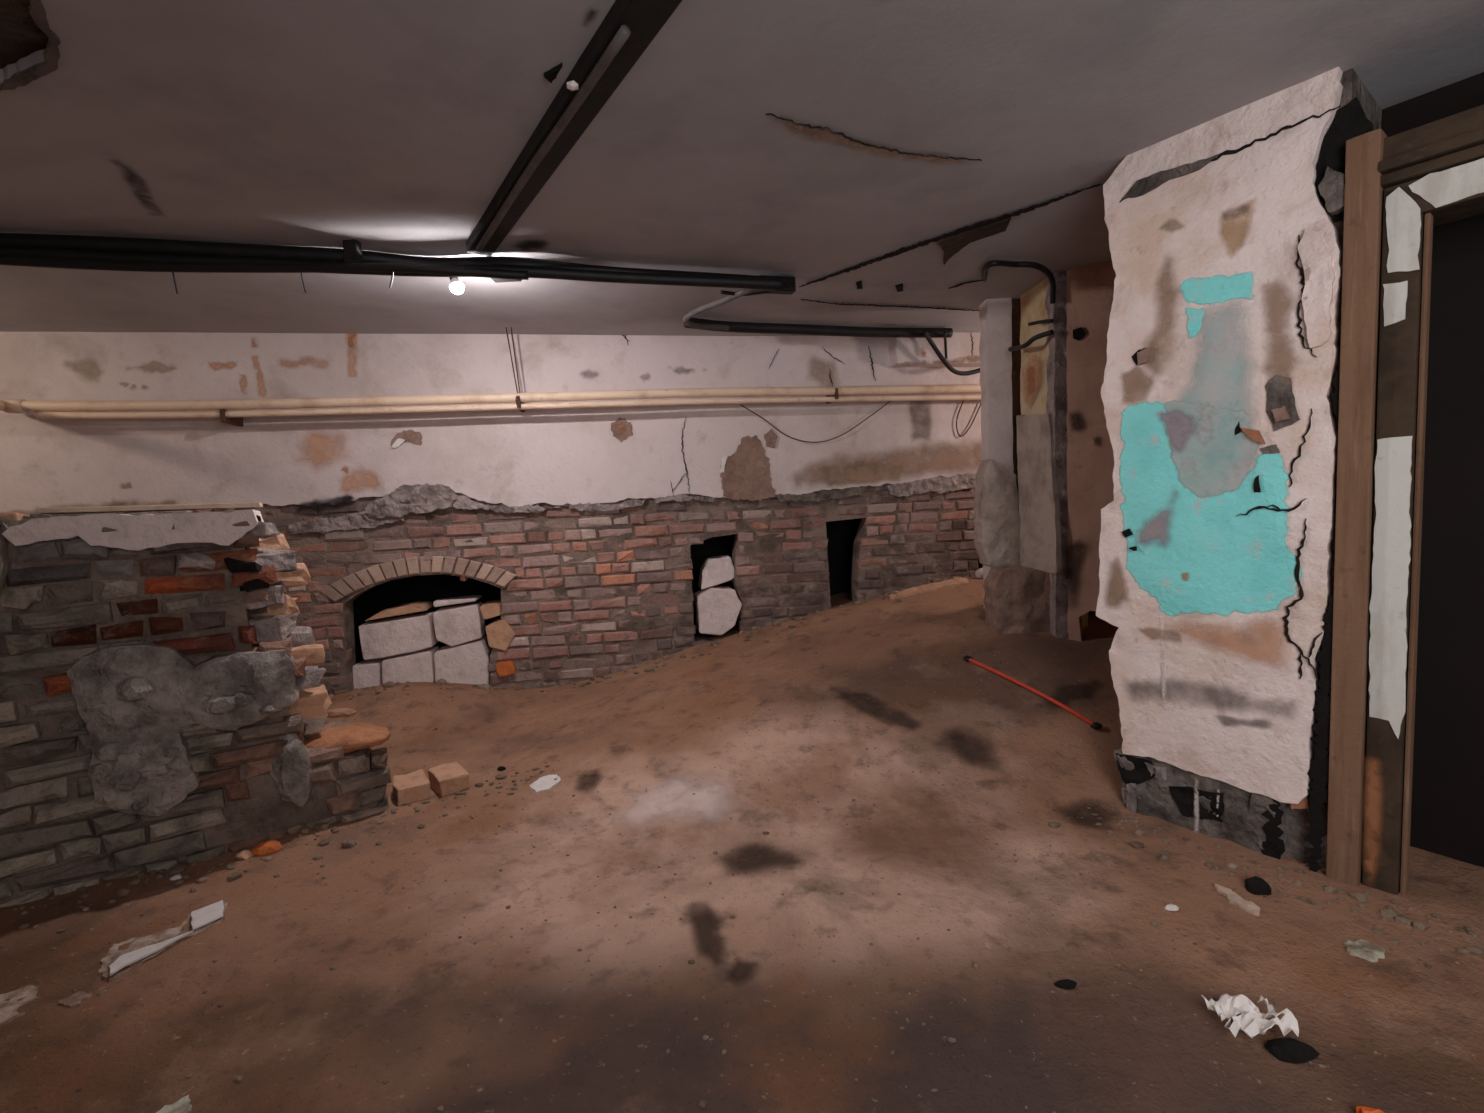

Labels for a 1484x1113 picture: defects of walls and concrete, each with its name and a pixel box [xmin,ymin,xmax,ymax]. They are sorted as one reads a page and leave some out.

spalling [0,0,60,91]
crack [766,113,982,161]
crack [1211,106,1340,161]
flaking render [885,472,977,497]
peeling [1120,272,1301,616]
flaking render [177,429,865,719]
crack [1236,235,1340,872]
spalling [1113,747,1309,857]